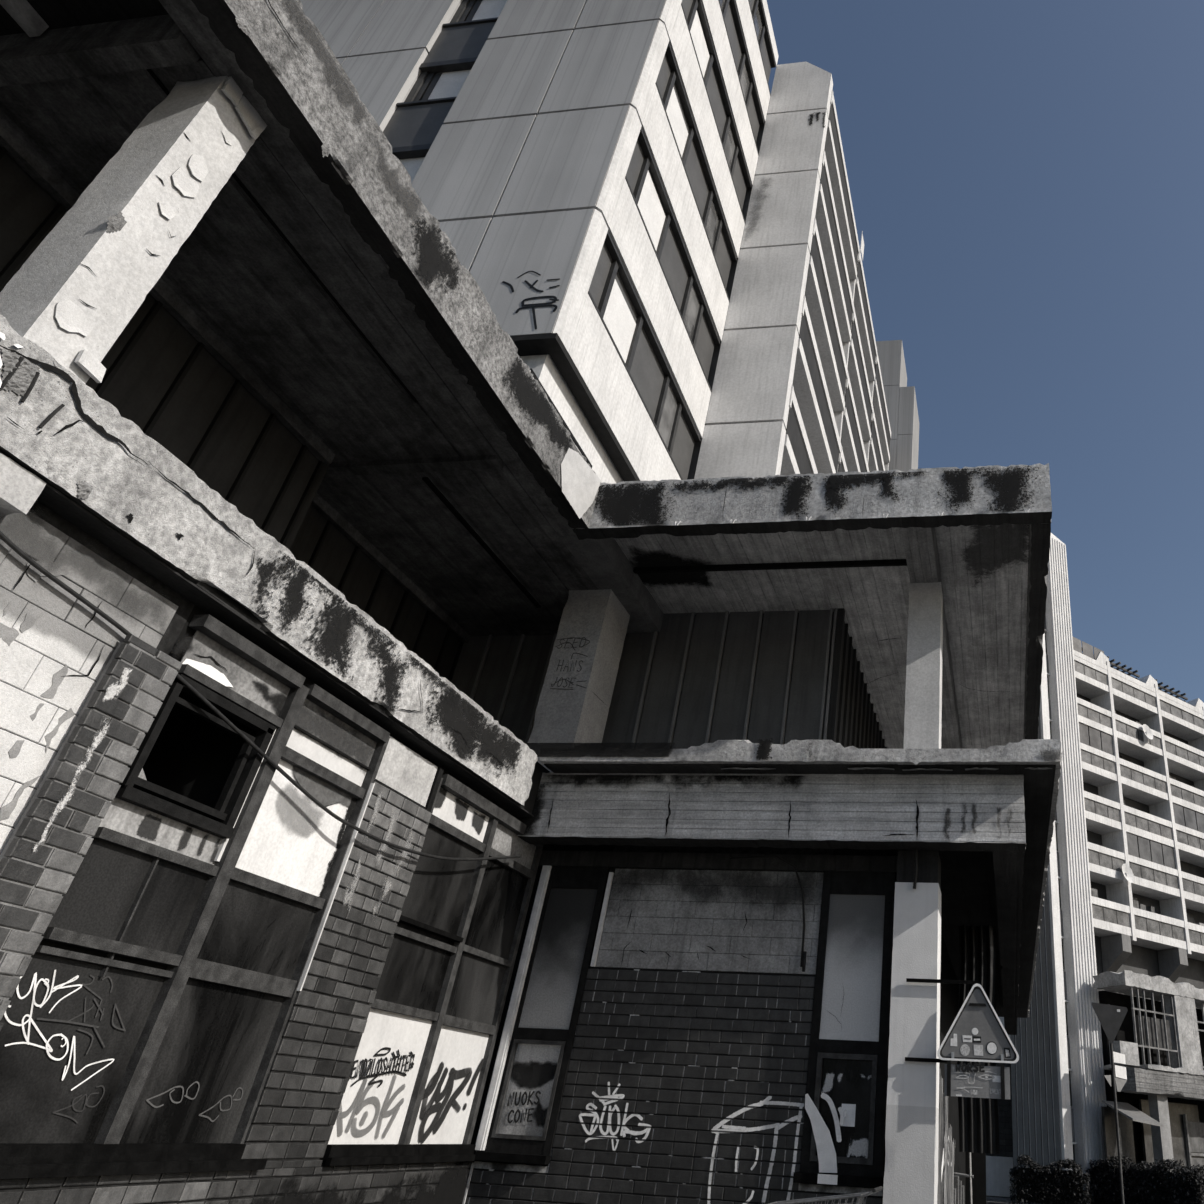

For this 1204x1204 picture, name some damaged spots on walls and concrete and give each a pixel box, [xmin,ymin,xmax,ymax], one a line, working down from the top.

peeling [172,154,209,198]
spalling [106,211,127,233]
damp [375,142,463,300]
spalling [0,332,40,403]
peeling [54,300,106,383]
spalling [38,404,65,429]
crack [0,345,255,577]
damp [595,465,1044,587]
damp [103,668,132,701]
damp [249,550,673,778]
damp [34,725,108,851]
damp [434,787,486,835]